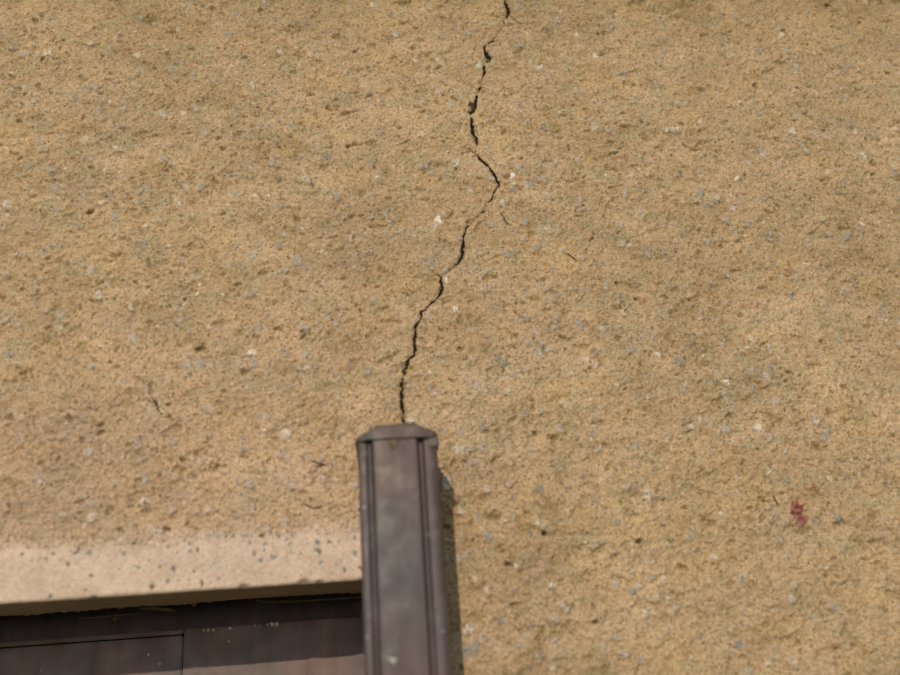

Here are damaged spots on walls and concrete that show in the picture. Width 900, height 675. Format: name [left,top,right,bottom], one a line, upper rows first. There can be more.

crack [399,0,521,423]